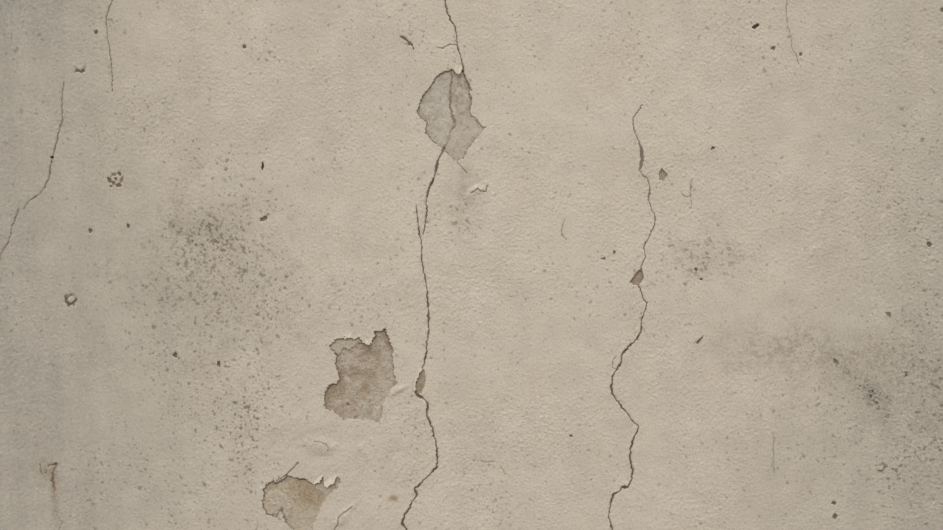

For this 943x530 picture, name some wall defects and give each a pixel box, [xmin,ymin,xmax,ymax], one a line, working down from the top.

crack [105,0,113,91]
crack [785,0,800,64]
peeling [417,65,486,161]
crack [0,82,65,282]
crack [401,0,488,530]
crack [608,105,656,530]
peeling [324,329,398,423]
crack [39,463,63,530]
peeling [262,475,342,530]